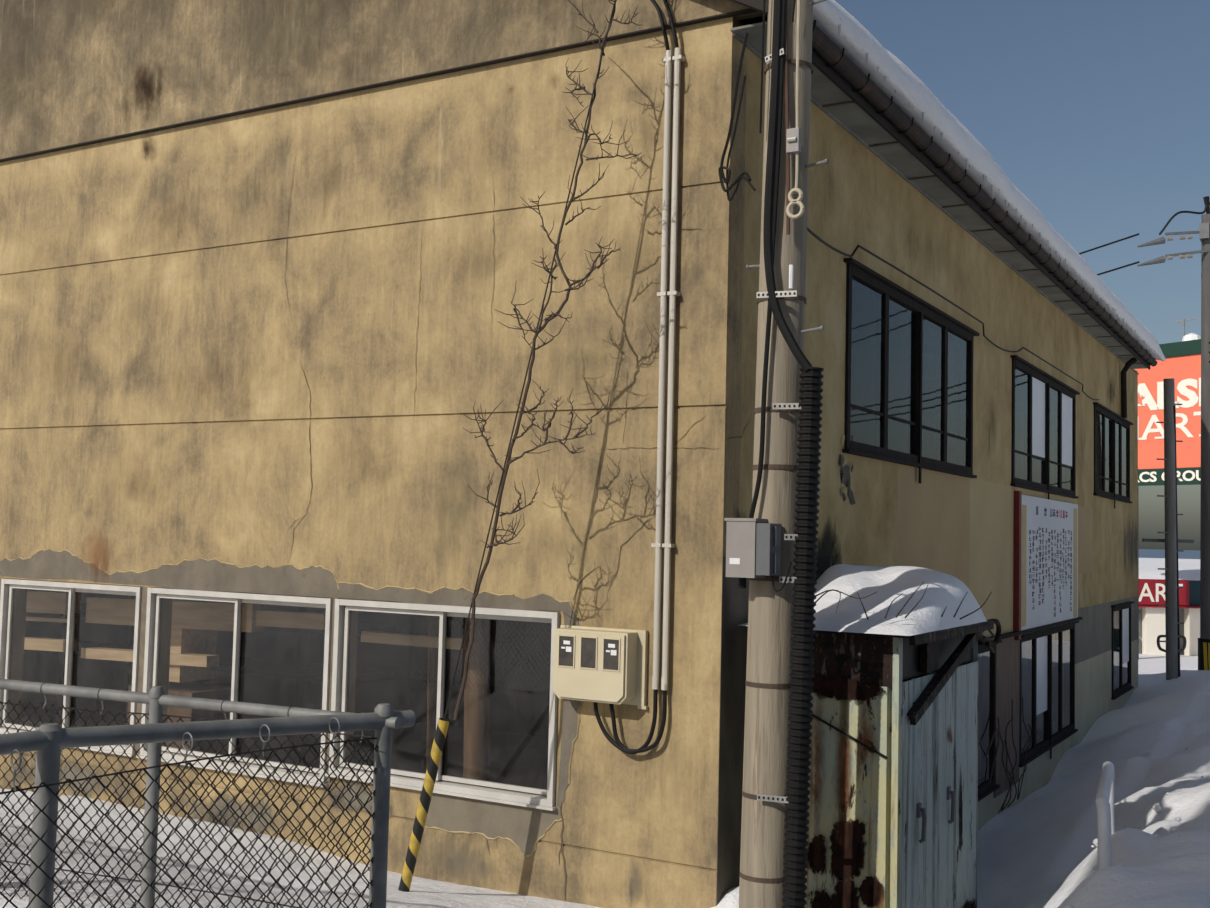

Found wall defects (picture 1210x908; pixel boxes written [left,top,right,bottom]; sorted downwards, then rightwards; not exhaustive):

crack [286,366,312,564]
flaking render [0,548,579,626]
flaking render [419,699,582,857]